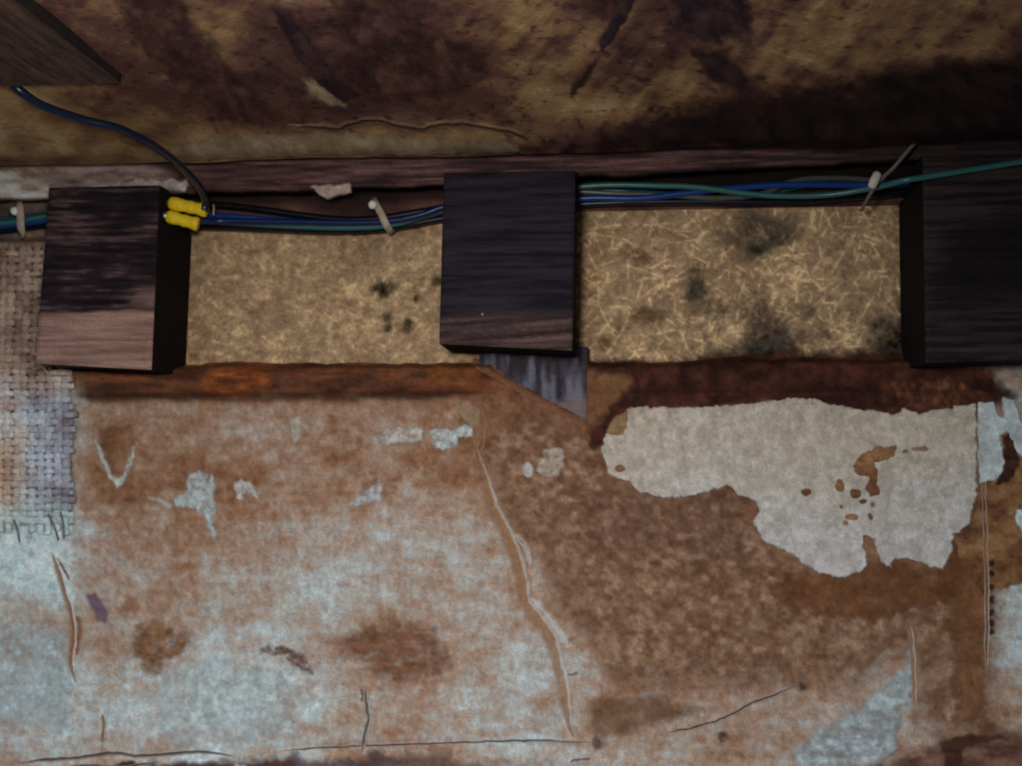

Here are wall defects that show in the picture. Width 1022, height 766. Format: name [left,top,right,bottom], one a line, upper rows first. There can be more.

water stain [120,0,268,120]
water stain [272,0,482,101]
water stain [677,0,752,92]
water stain [373,282,394,298]
peeling [380,405,480,450]
peeling [150,471,216,539]
peeling [601,397,1022,577]
rust [955,458,1022,594]
crack [51,553,84,682]
crack [20,714,235,766]
crack [279,688,595,762]
peeling [795,625,918,766]